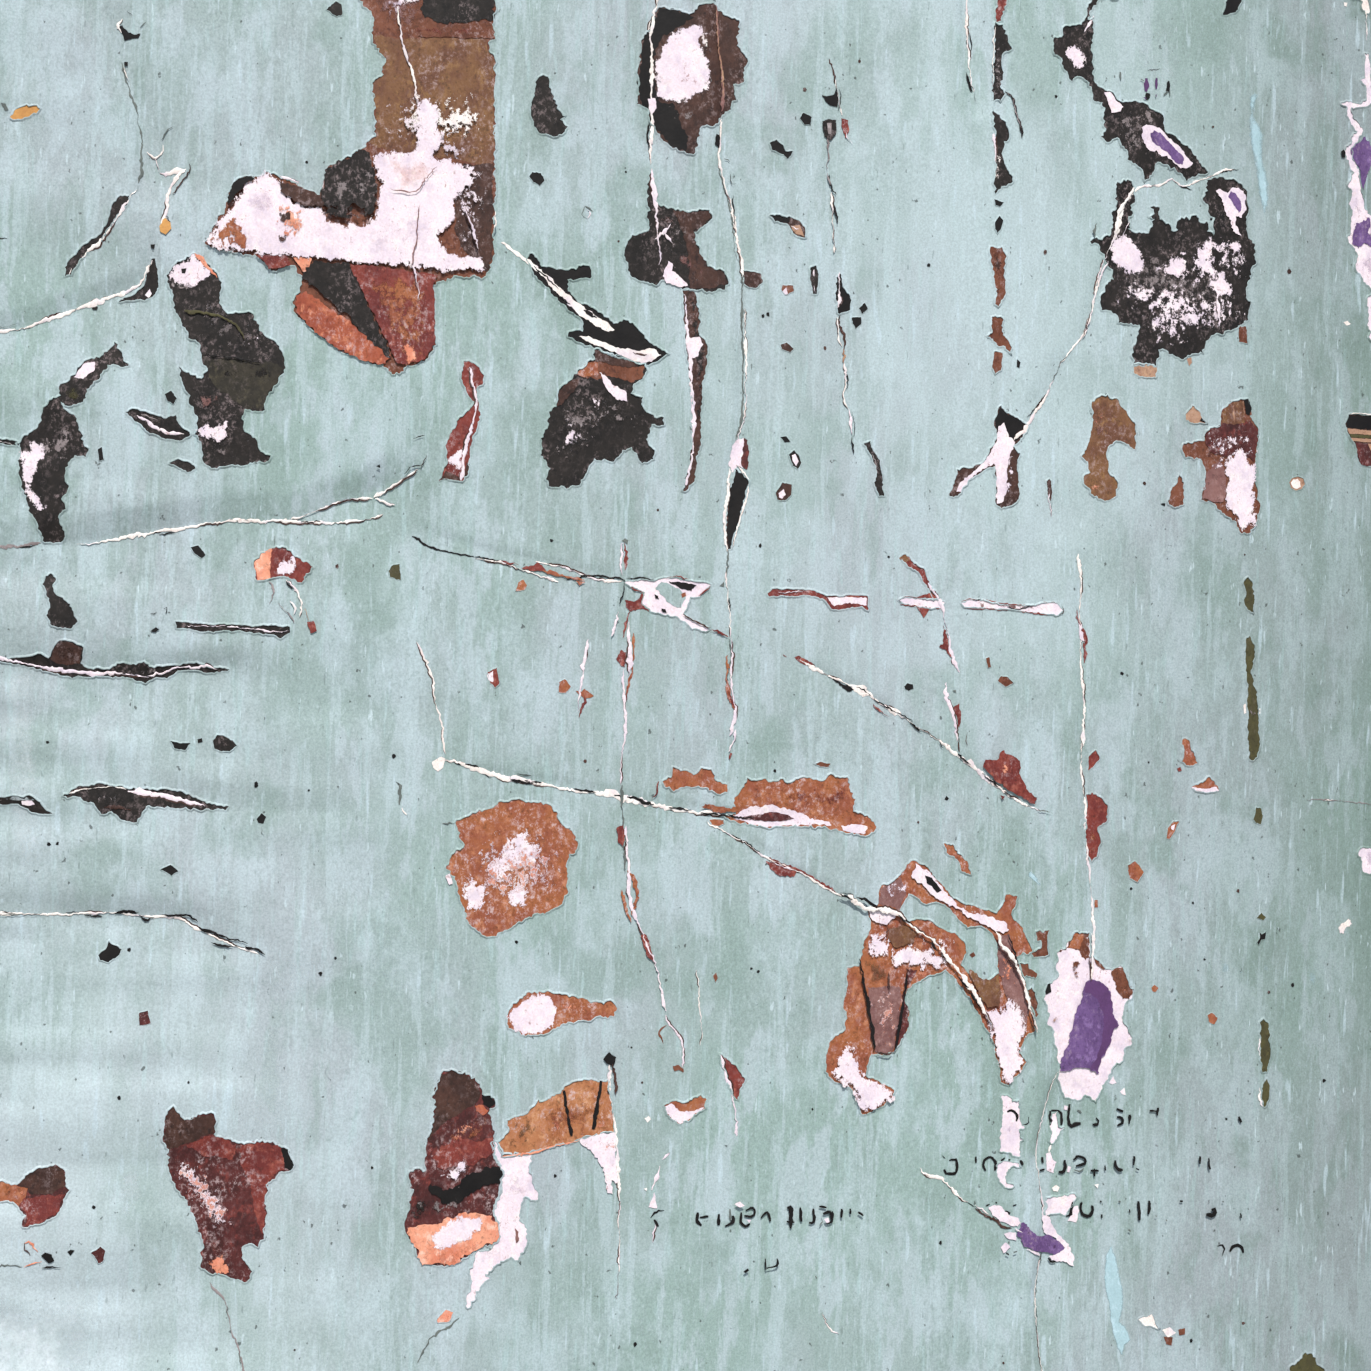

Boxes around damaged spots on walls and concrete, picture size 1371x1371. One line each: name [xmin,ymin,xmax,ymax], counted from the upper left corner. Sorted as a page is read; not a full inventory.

peeling [164,0,498,484]
peeling [1051,0,1258,379]
crack [0,542,41,550]
crack [79,435,427,545]
peeling [538,347,666,491]
crack [501,119,751,759]
crack [397,782,407,815]
crack [412,536,852,1072]
crack [765,552,1096,965]
peeling [823,858,1159,1117]
peeling [160,1104,296,1285]
peeling [402,1052,618,1269]